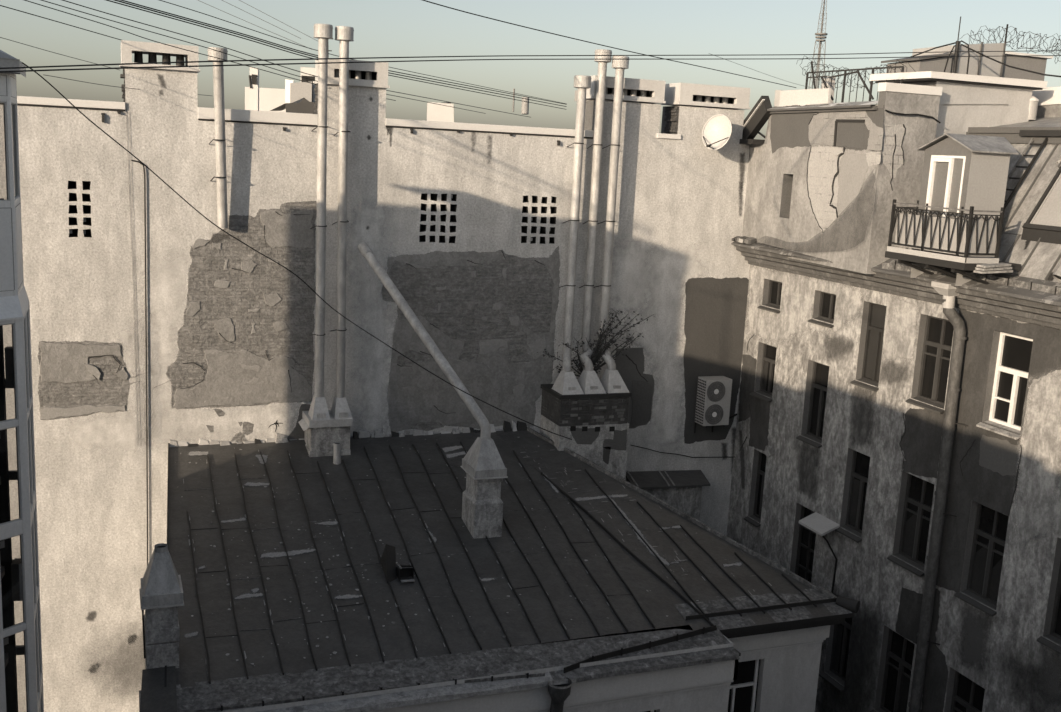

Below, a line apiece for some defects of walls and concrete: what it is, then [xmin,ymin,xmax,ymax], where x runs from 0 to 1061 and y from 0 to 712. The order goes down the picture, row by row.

crack [807,113,846,232]
crack [890,124,906,191]
peeling [192,239,230,288]
peeling [241,209,315,273]
flaking render [382,254,554,390]
peeling [39,342,129,383]
peeling [174,318,312,409]
peeling [409,400,477,431]